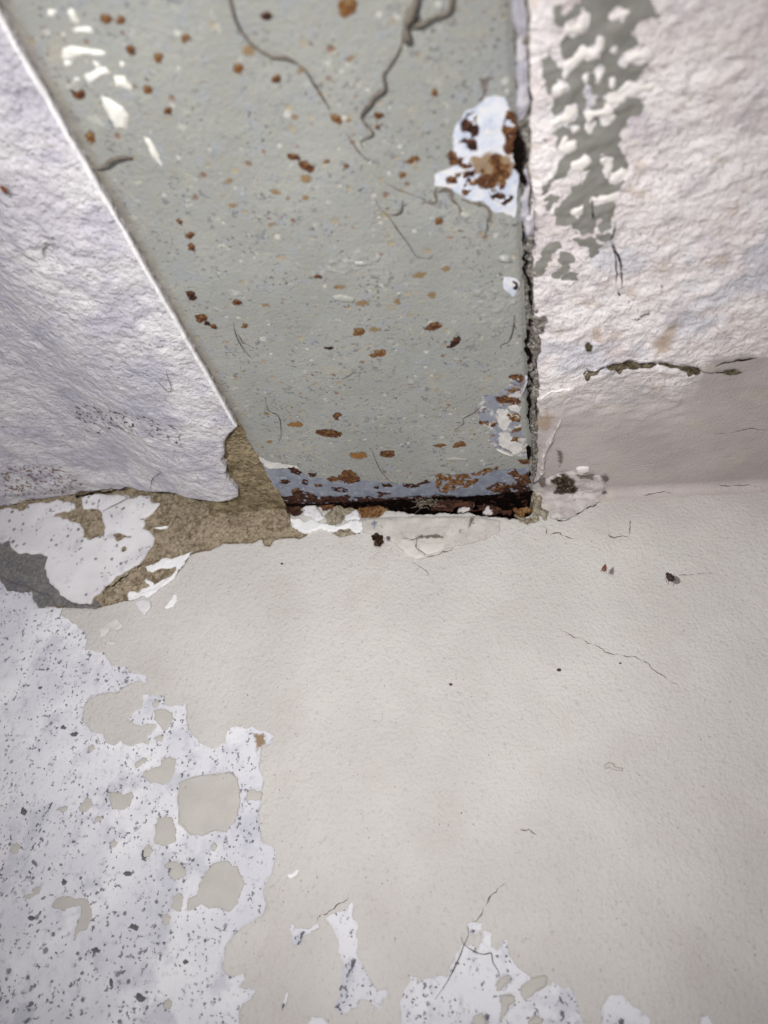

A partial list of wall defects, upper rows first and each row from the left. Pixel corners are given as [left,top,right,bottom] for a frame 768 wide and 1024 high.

rust [100,14,126,24]
rust [338,0,357,18]
rust [233,46,254,73]
rust [287,154,330,182]
rust [176,219,195,252]
crack [512,79,536,480]
rust [195,314,217,329]
crack [583,358,756,381]
rust [282,459,531,518]
peeling [0,374,583,1024]
peeling [601,994,650,1024]